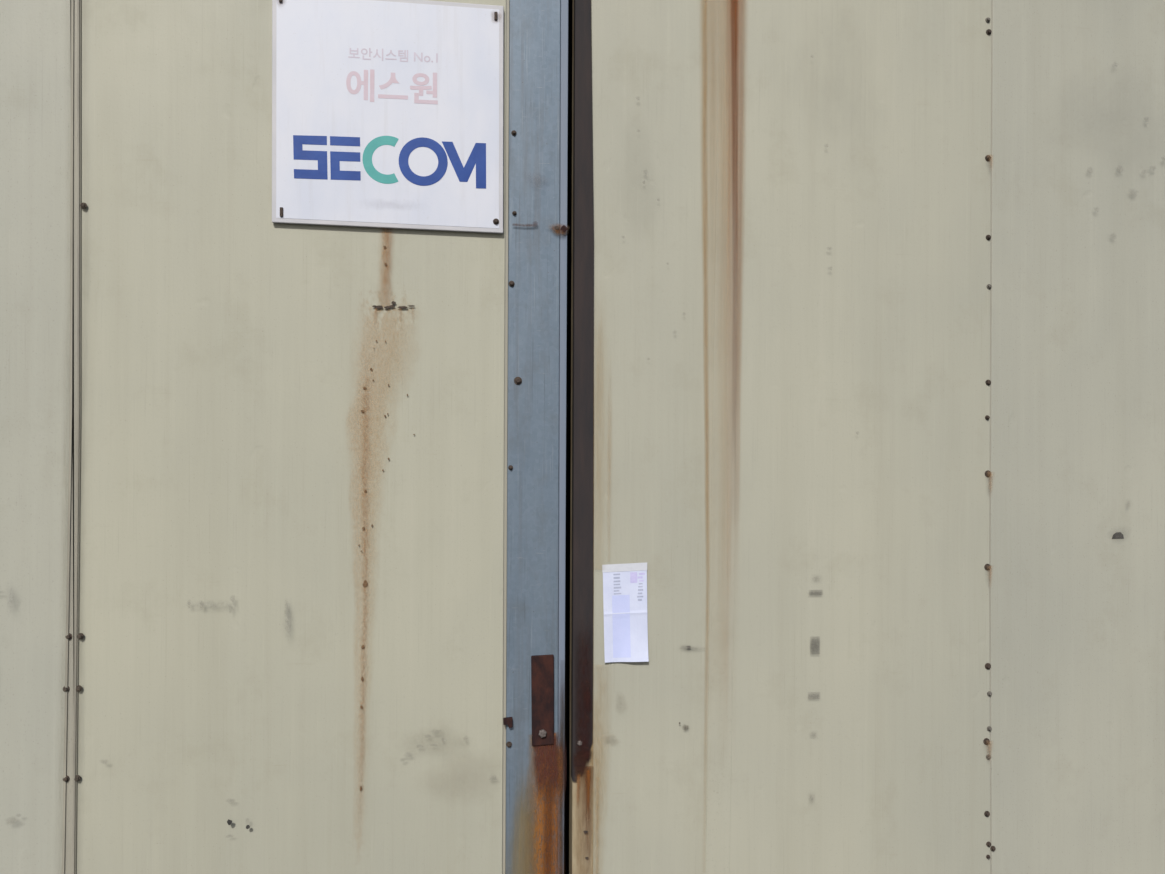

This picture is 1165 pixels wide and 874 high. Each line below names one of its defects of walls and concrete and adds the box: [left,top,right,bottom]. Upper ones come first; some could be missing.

rust [513,645,591,874]